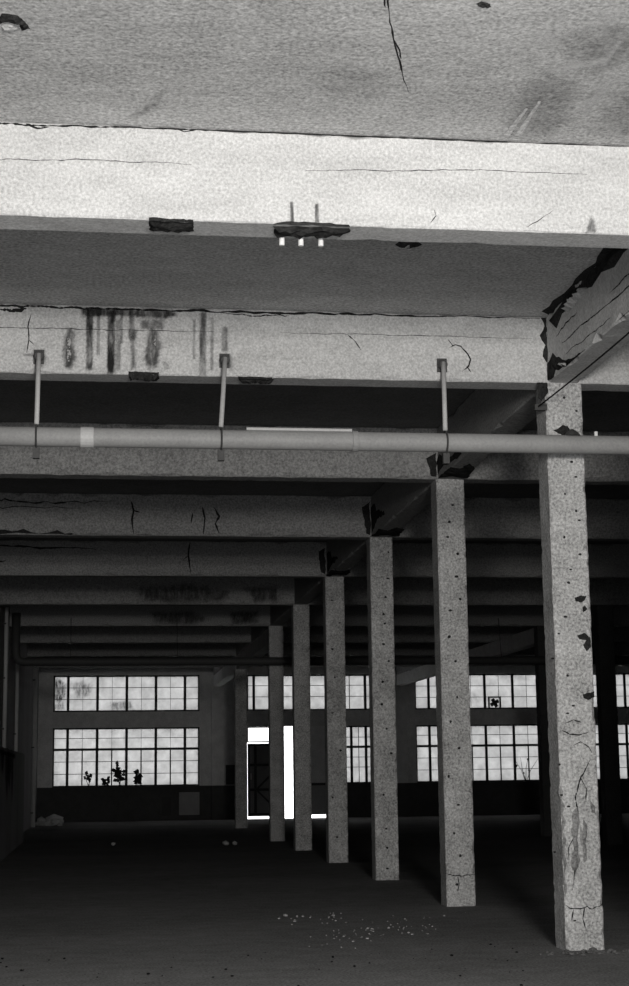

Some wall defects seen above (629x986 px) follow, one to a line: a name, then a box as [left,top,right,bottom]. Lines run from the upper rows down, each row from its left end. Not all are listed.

spalling [0,13,30,31]
crack [384,0,408,89]
damp [82,308,175,373]
crack [0,274,629,372]
spalling [537,248,628,401]
spalling [426,452,475,479]
crack [183,507,220,573]
spalling [319,548,351,577]
spalling [362,502,404,536]
spalling [577,633,591,651]